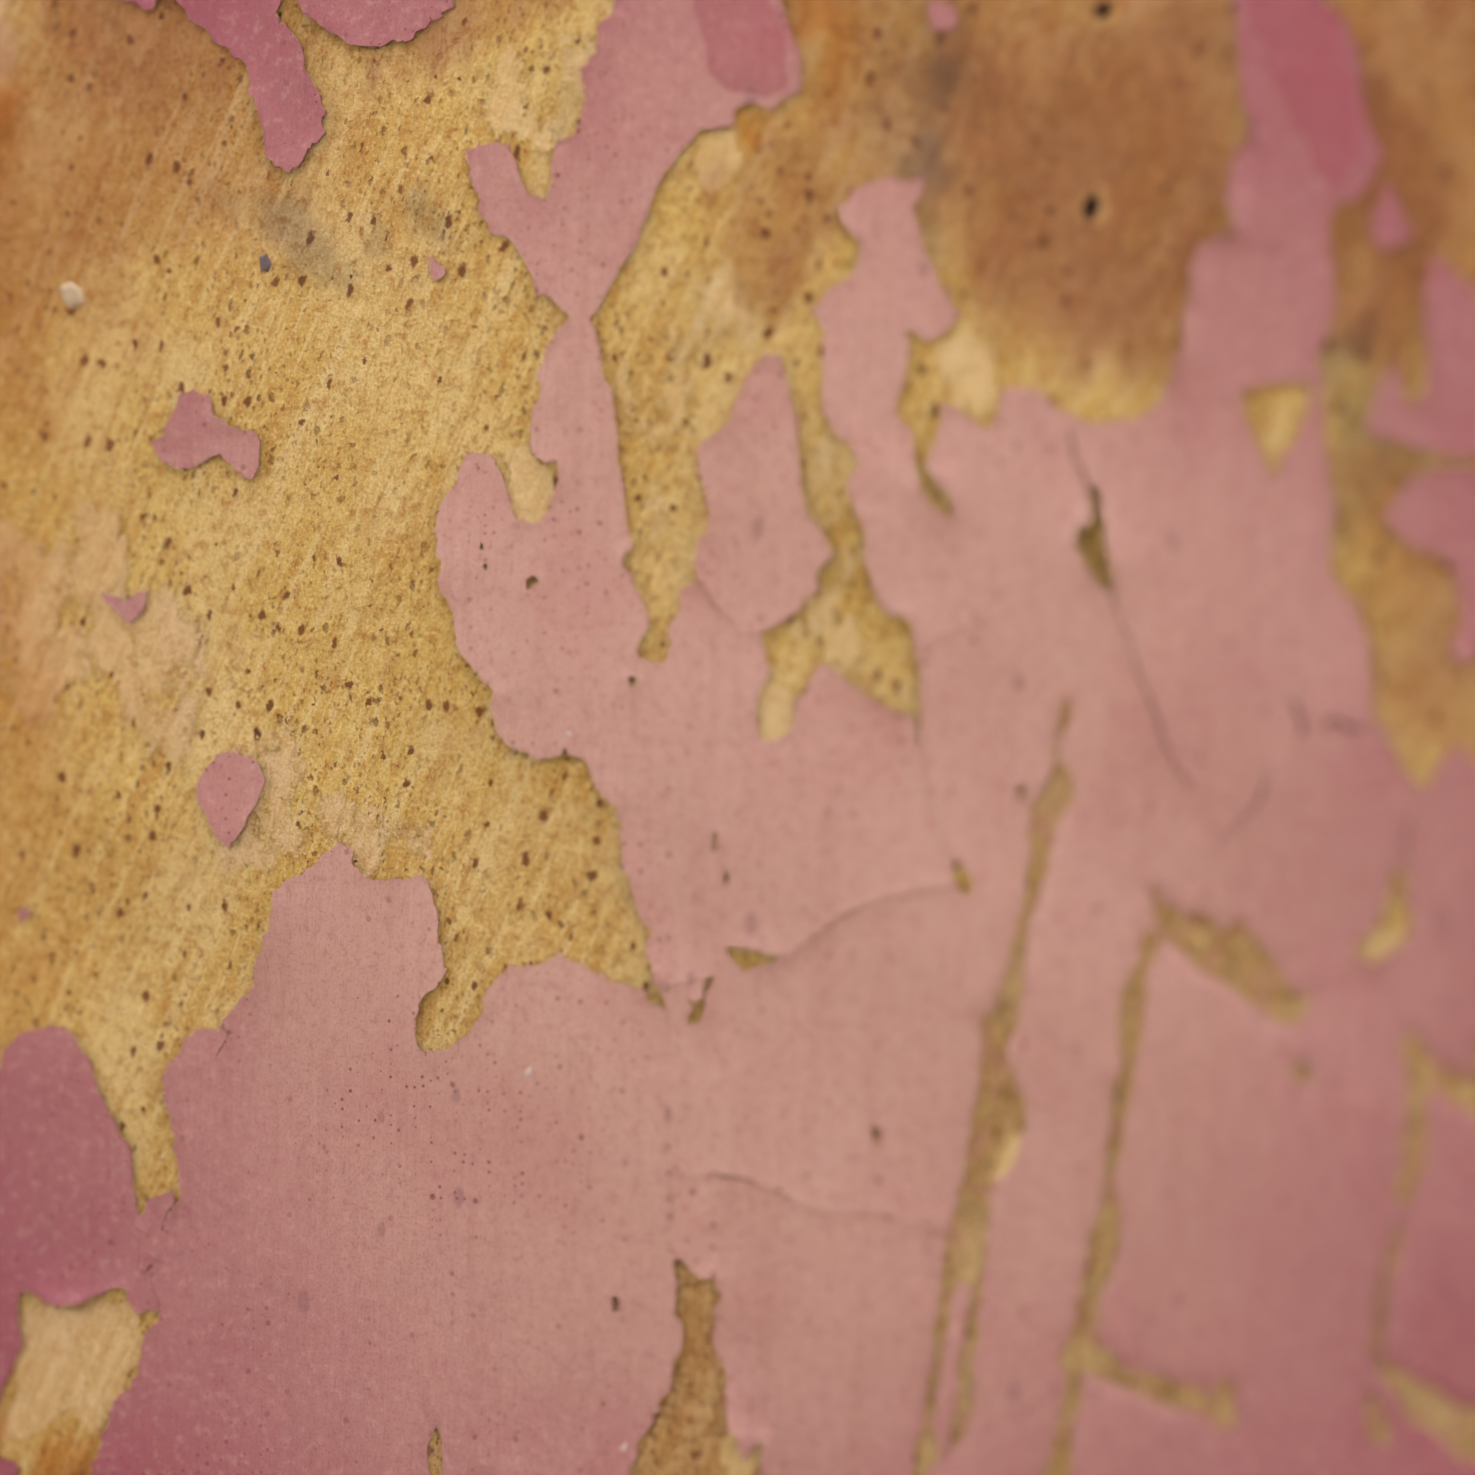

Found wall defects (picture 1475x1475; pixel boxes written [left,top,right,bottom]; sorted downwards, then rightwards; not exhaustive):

peeling [1241,0,1475,792]
peeling [0,0,666,1215]
peeling [688,976,713,1025]
peeling [726,947,784,971]
peeling [952,859,972,896]
peeling [1353,853,1412,963]
flaking render [989,1134,1021,1181]
peeling [620,1258,763,1475]